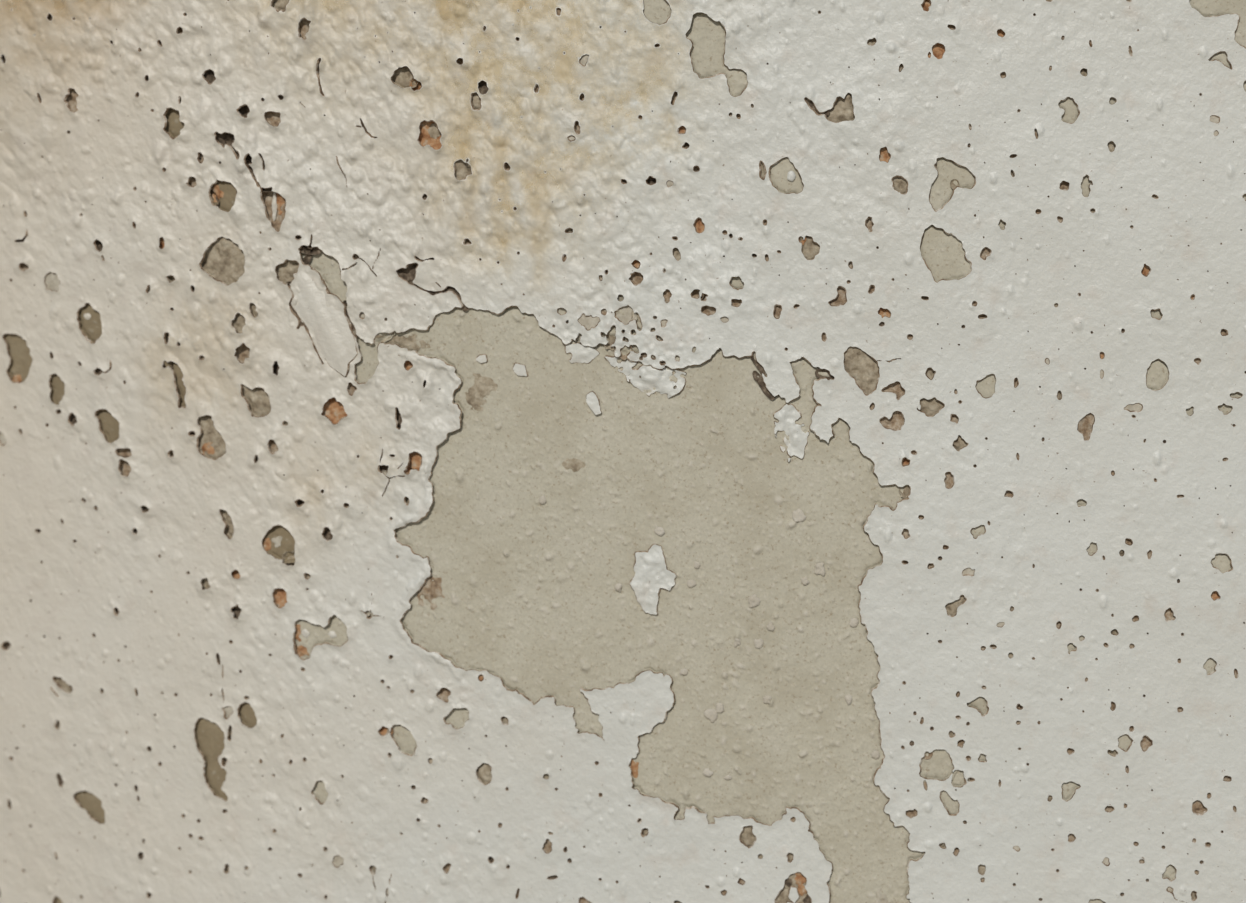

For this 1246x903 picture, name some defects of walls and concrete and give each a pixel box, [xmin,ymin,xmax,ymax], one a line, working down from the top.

peeling [1189,0,1246,47]
peeling [686,13,748,97]
peeling [920,158,990,282]
peeling [976,374,996,398]
spalling [944,473,954,488]
peeling [971,525,985,538]
peeling [276,243,925,903]
peeling [945,596,966,616]
peeling [967,697,988,716]
peeling [195,703,257,800]
peeling [920,740,973,814]